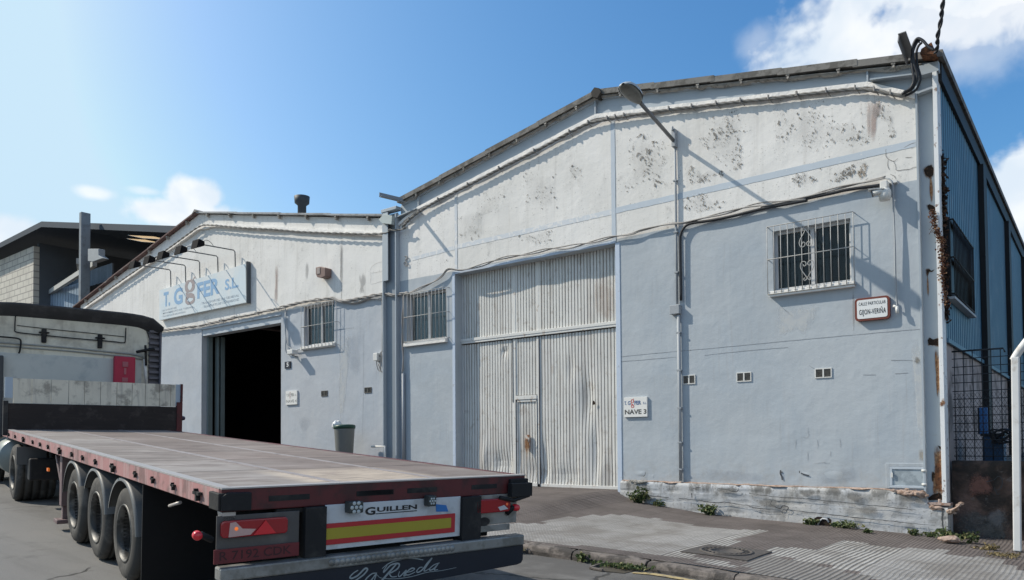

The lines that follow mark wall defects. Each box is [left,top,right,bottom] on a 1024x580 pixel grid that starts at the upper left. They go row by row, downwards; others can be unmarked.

rust [928,446,942,500]
peeling [891,475,992,515]